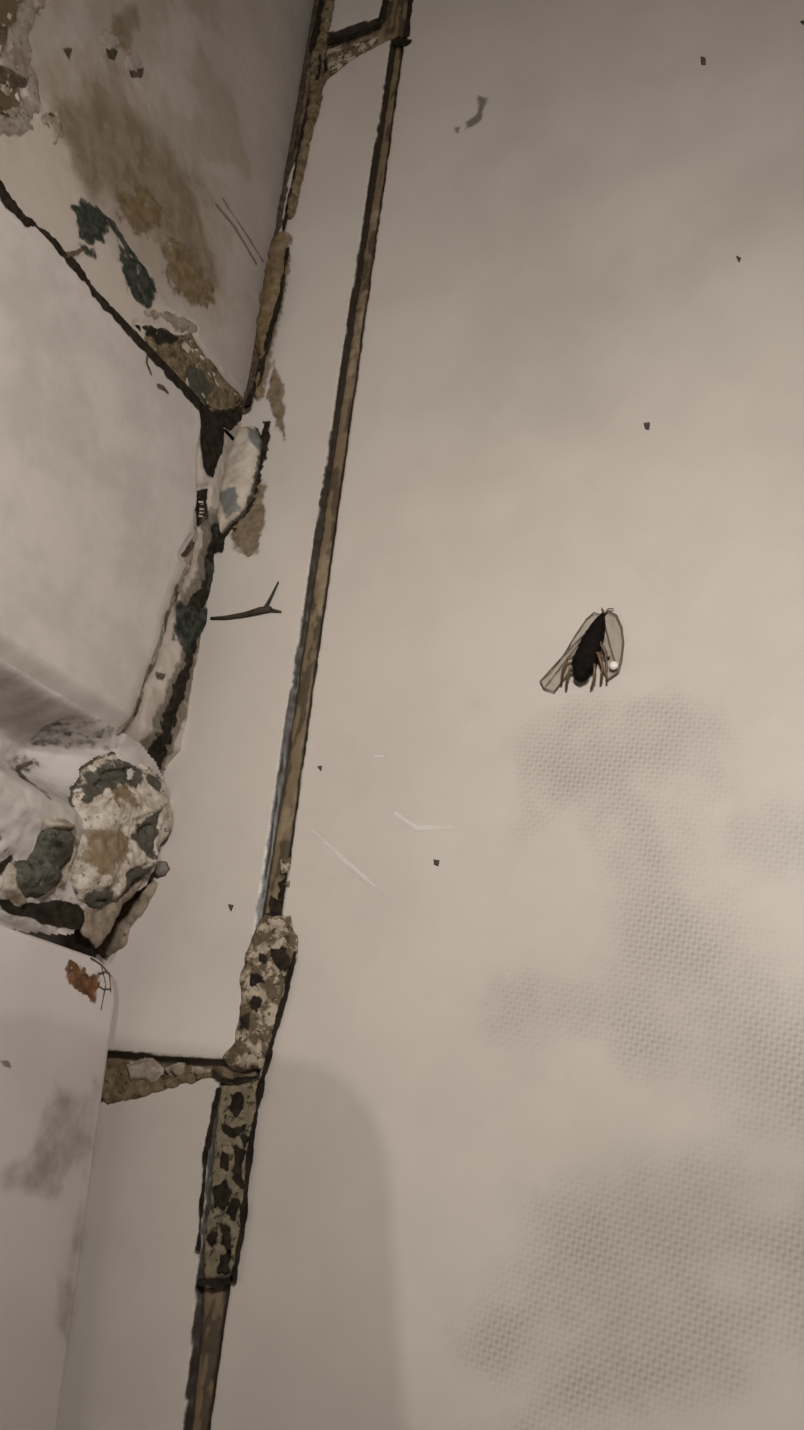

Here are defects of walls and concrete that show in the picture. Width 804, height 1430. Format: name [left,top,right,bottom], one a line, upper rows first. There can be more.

peeling [0,0,63,145]
leakage [60,88,215,309]
spalling [135,310,243,416]
crack [0,180,271,773]
spalling [0,526,198,949]